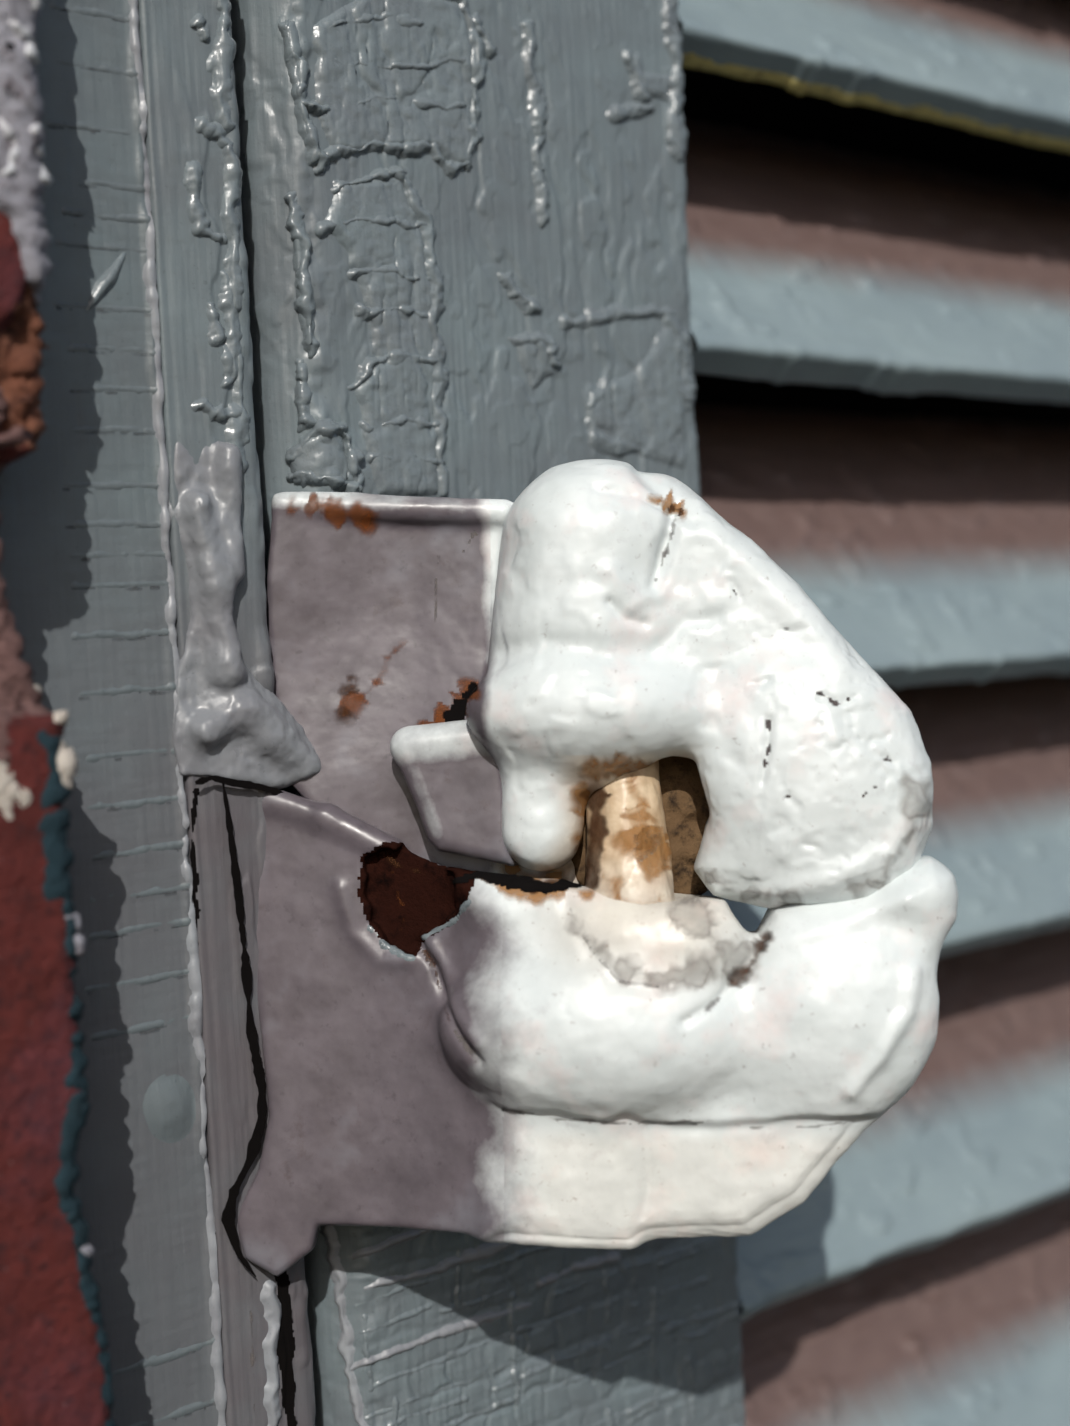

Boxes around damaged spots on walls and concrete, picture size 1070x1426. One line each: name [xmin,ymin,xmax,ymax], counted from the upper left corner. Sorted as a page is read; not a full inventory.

peeling [0,0,55,451]
crack [55,176,151,253]
crack [63,480,171,590]
rust [288,493,375,532]
crack [79,682,176,698]
rust [338,677,381,718]
rust [419,680,479,725]
rust [475,754,709,904]
crack [422,950,442,989]
crack [84,775,297,1426]
crack [502,1108,699,1125]
crack [321,1225,741,1426]